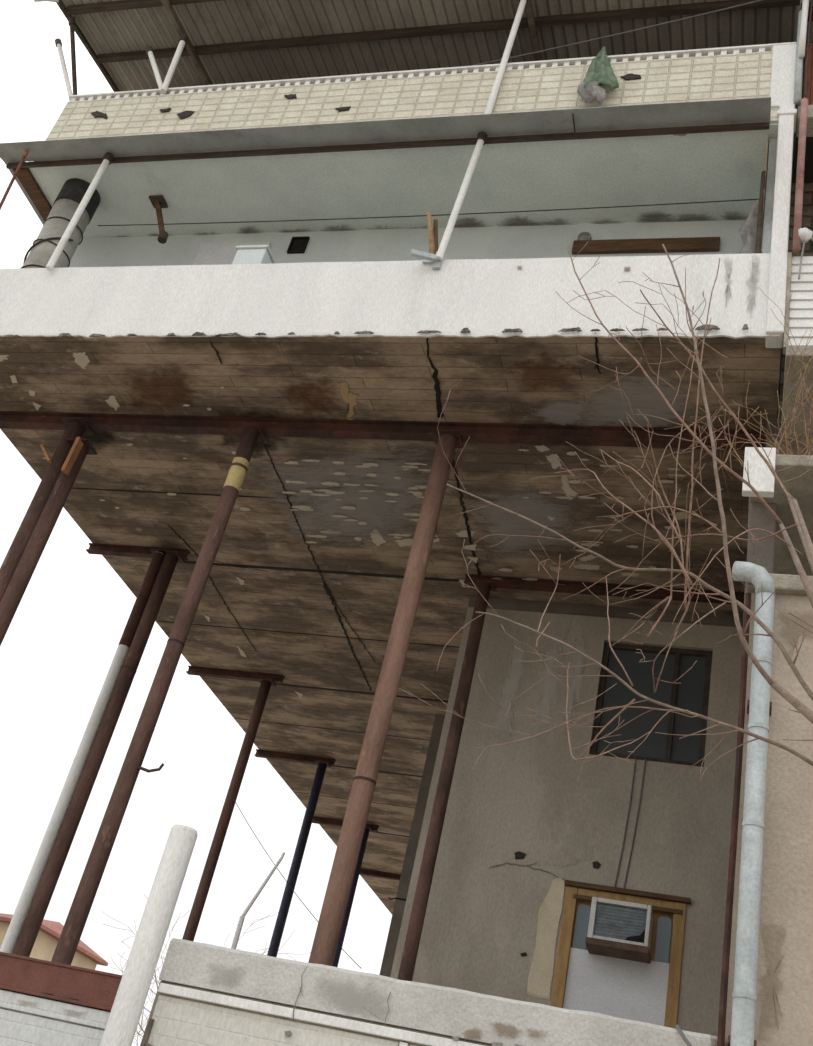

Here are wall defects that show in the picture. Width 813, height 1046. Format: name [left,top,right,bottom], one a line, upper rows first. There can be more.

spalling [159,108,194,119]
spalling [73,352,90,369]
crack [426,338,444,418]
crack [593,333,601,374]
spalling [105,396,120,411]
flaking render [518,445,618,500]
flaking render [282,461,431,547]
crack [451,460,481,575]
flaking render [455,530,478,563]
crack [264,445,375,691]
crack [489,862,563,879]
water stain [494,1023,542,1037]